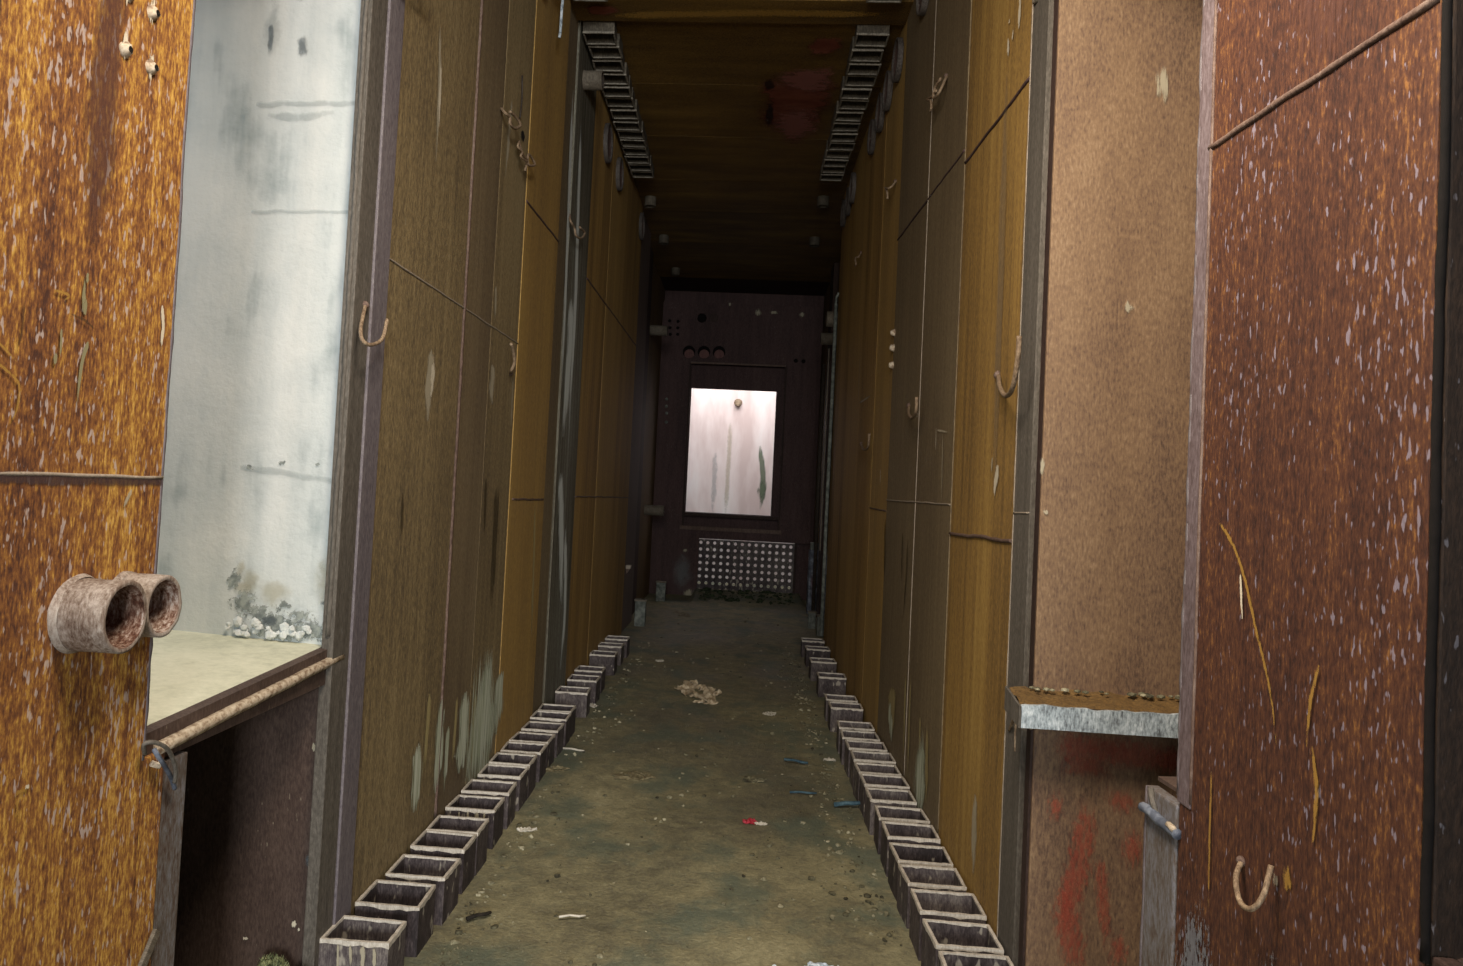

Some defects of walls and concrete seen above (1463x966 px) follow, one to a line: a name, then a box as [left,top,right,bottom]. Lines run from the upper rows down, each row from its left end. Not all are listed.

rust [85,0,123,233]
peeling [1175,906,1212,966]